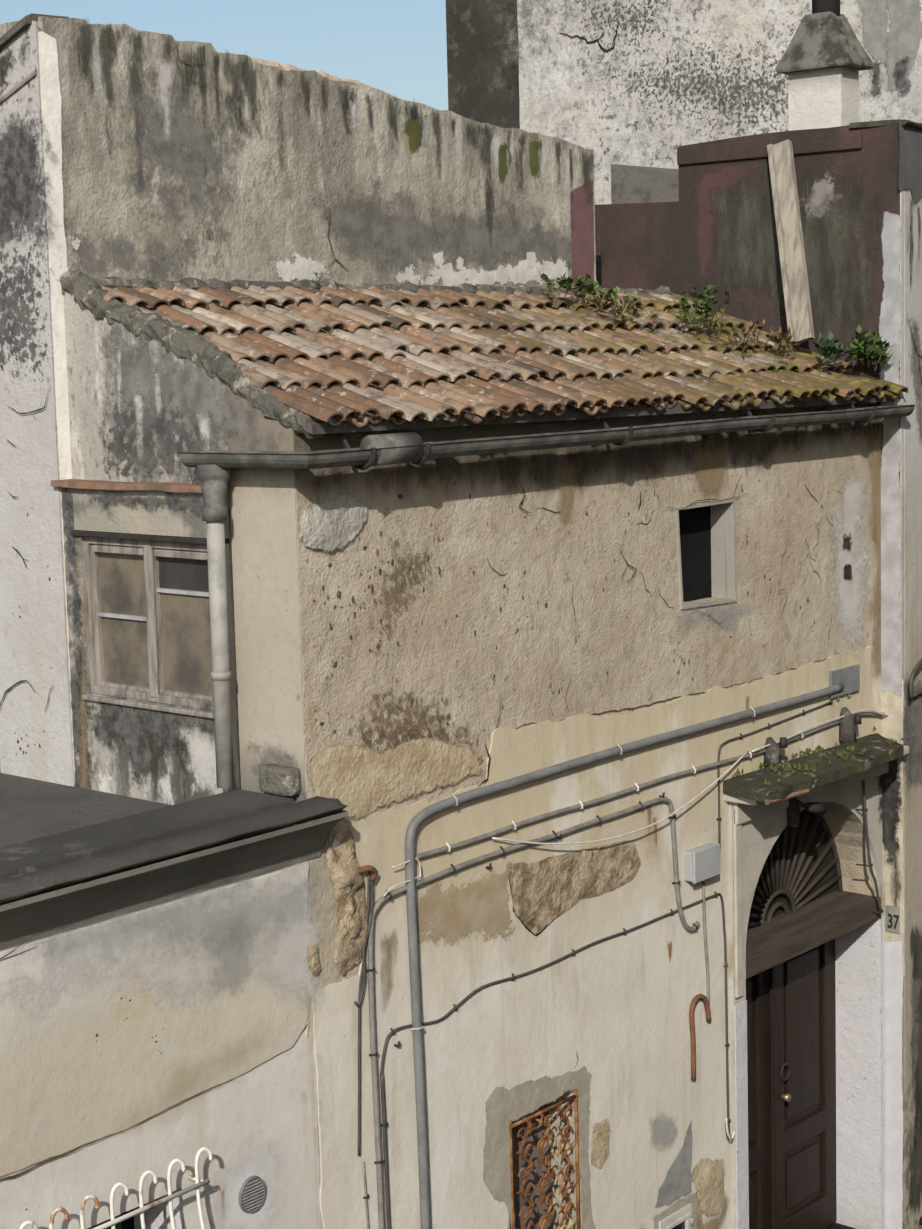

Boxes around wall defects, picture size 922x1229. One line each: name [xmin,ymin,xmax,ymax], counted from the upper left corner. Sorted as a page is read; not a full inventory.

leakage [0,110,52,256]
leakage [63,21,258,222]
peeling [274,251,329,282]
leakage [301,73,593,272]
peeling [396,250,571,287]
crack [560,10,620,52]
mould [61,487,215,798]
spalling [307,522,492,820]
leakage [420,419,881,675]
crack [0,940,35,961]
spalling [416,840,641,945]
leakage [909,929,922,1211]